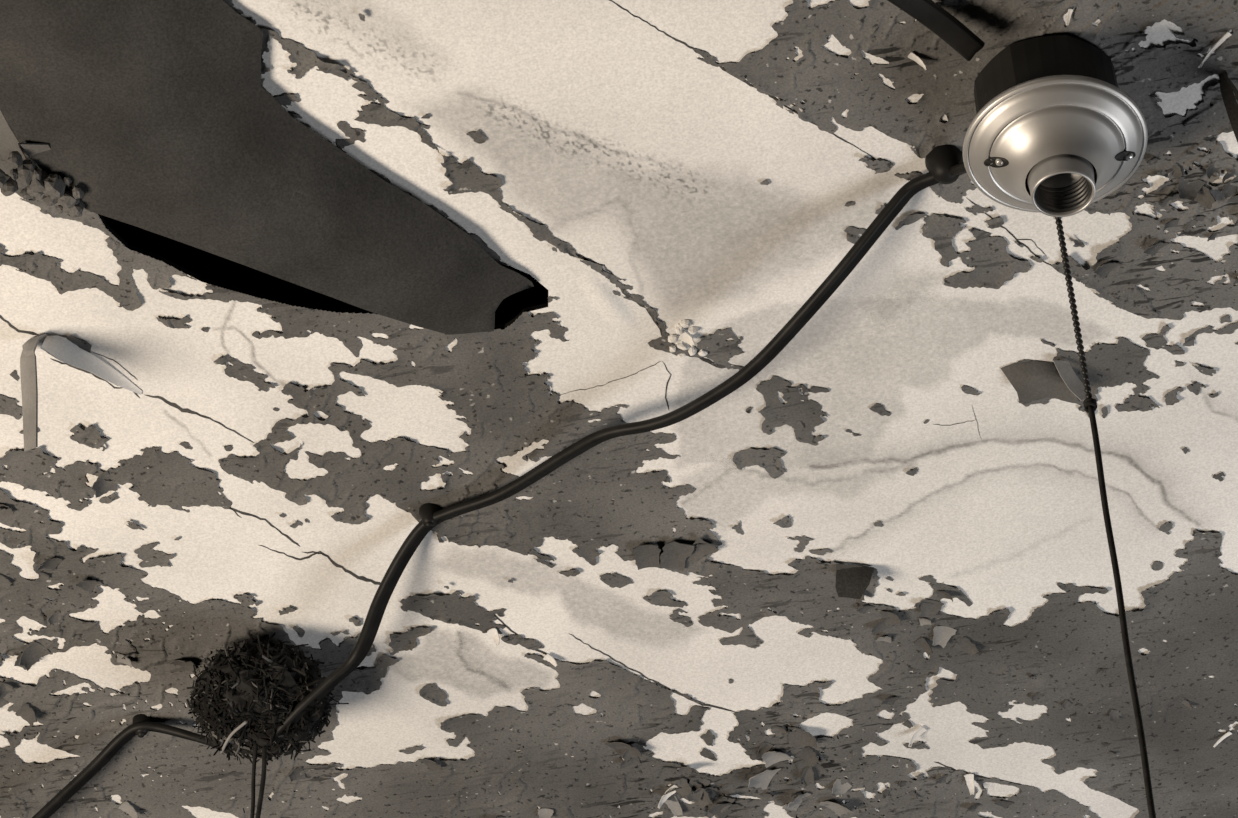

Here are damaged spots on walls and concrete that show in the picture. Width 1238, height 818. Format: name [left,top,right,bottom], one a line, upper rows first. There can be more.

crack [0,315,254,443]
crack [222,507,380,585]
peeling [0,0,744,525]
peeling [0,334,1238,818]
crack [609,0,876,160]
peeling [690,0,1238,418]